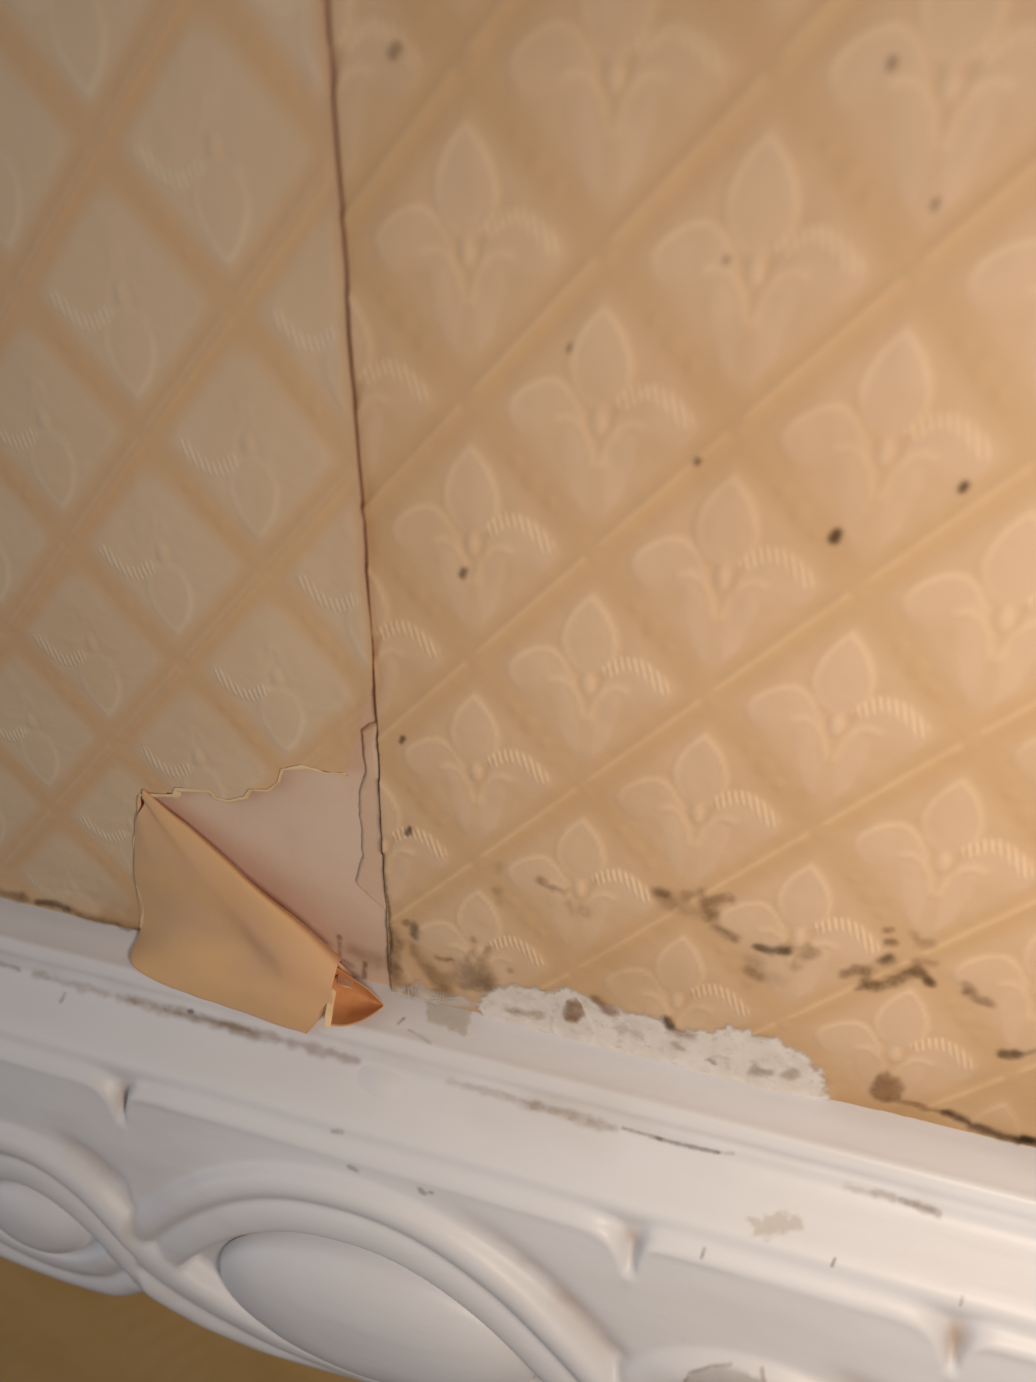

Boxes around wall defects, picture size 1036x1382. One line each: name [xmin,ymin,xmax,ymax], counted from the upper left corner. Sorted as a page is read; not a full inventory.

damp [566,999,615,1022]
damp [872,1076,902,1102]